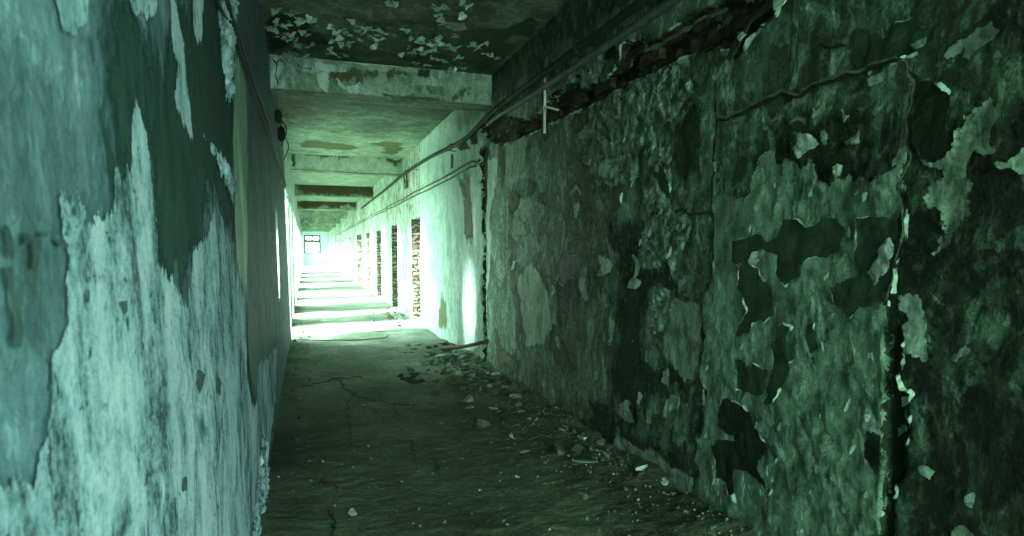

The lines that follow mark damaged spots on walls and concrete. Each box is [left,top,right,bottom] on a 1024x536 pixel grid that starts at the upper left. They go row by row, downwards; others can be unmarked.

peeling [57,0,89,37]
peeling [129,0,157,21]
peeling [170,0,204,141]
spalling [264,0,539,102]
spalling [851,16,999,86]
flaking render [451,0,787,351]
crack [653,6,920,306]
peeling [0,52,277,536]
peeling [613,81,1024,536]
crack [689,325,707,461]